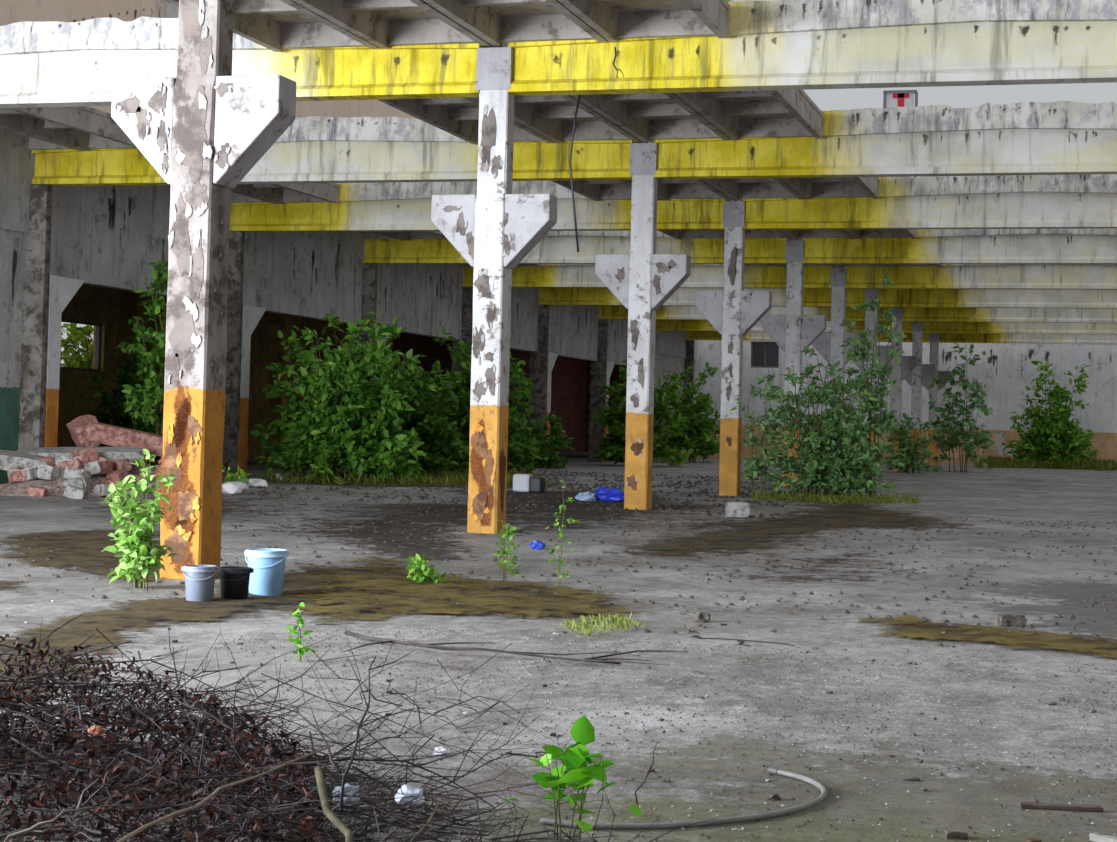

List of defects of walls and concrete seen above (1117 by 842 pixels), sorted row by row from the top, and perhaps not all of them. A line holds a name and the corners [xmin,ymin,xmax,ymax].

peeling [478,104,503,179]
peeling [115,0,233,386]
peeling [493,197,511,257]
peeling [441,205,500,401]
peeling [615,267,625,283]
peeling [652,259,679,295]
peeling [630,319,646,408]
rust [154,383,196,574]
rust [469,418,506,526]
peeling [626,474,639,491]
peeling [630,438,644,457]